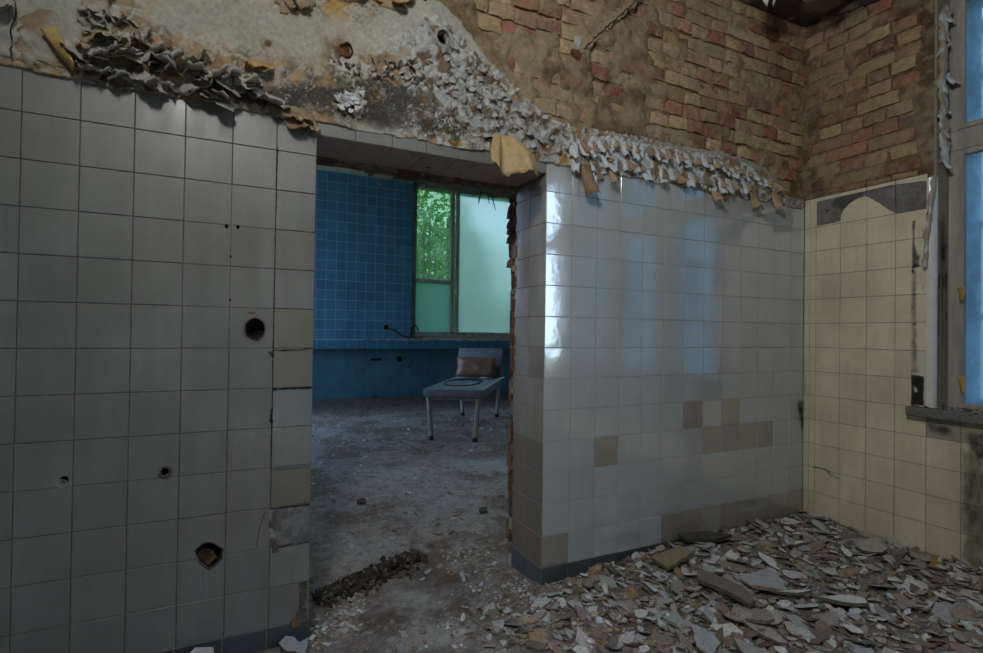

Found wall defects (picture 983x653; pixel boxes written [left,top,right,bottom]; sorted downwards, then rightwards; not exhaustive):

peeling [0,0,321,136]
spalling [316,0,960,554]
spalling [194,542,223,570]
peeling [269,503,310,553]